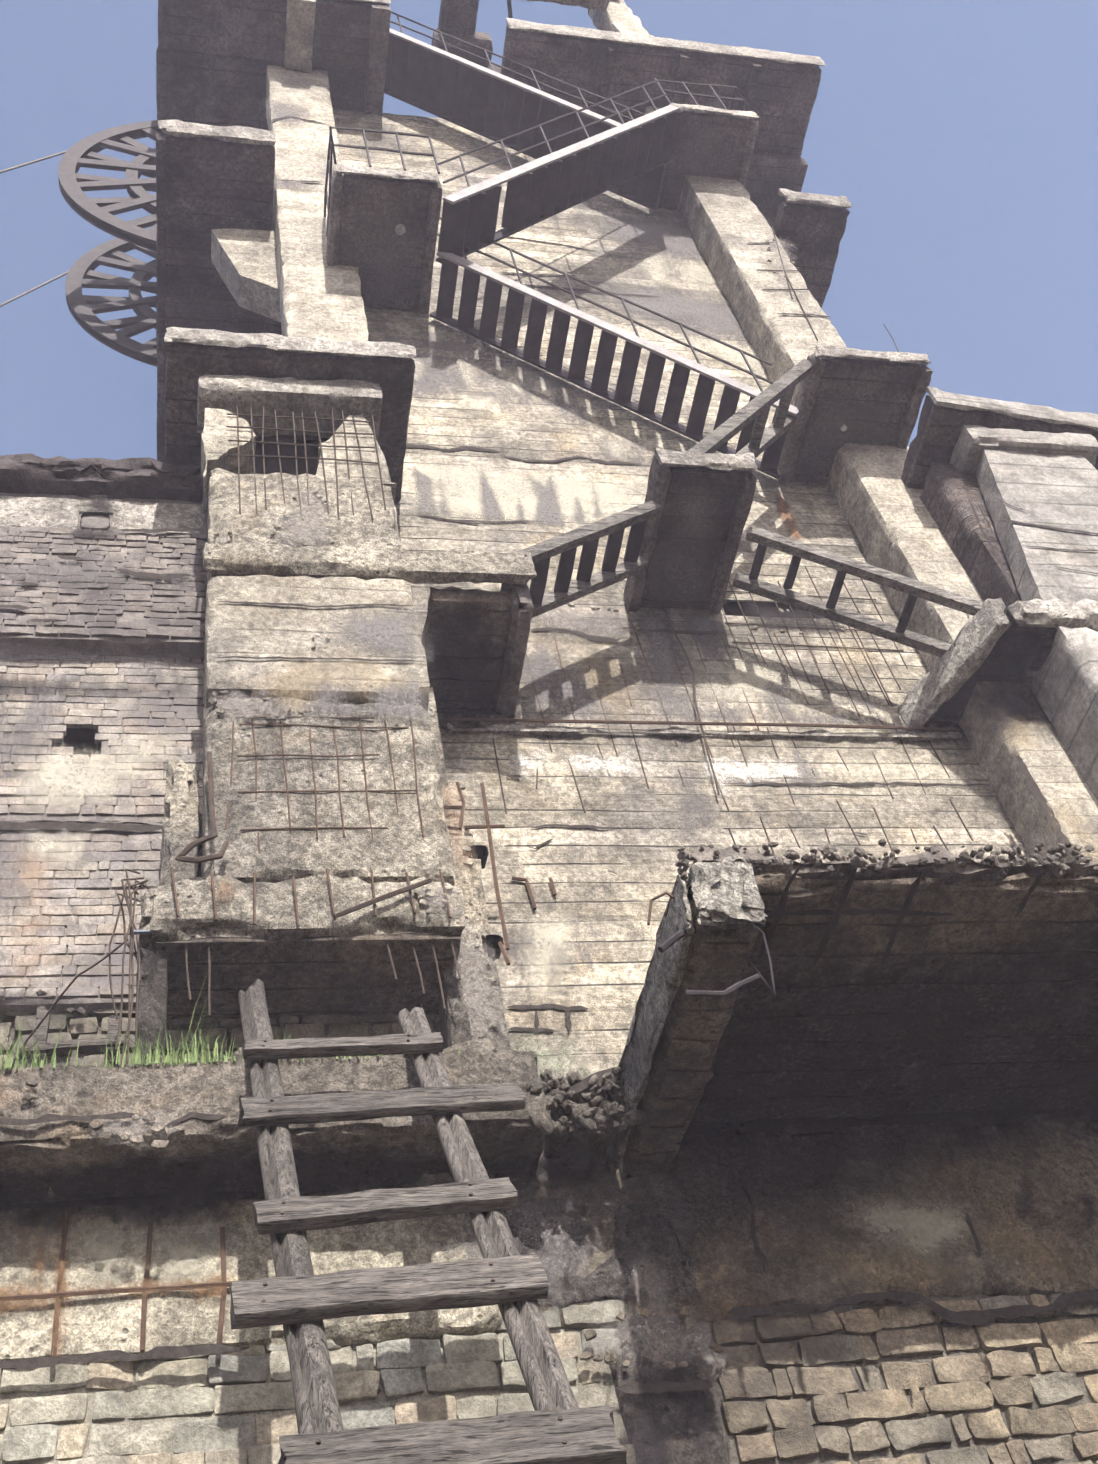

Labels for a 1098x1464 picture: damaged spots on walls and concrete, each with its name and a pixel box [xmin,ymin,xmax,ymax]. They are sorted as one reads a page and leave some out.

spalling [226,403,386,547]
spalling [170,690,424,927]
spalling [412,566,1098,1041]
crack [722,779,986,787]
crack [1013,753,1083,917]
spalling [326,868,455,920]
spalling [490,1067,648,1145]
corrosion [300,1188,374,1197]
corrosion [0,1197,286,1362]
corrosion [306,1213,483,1275]
corrosion [323,1304,503,1347]